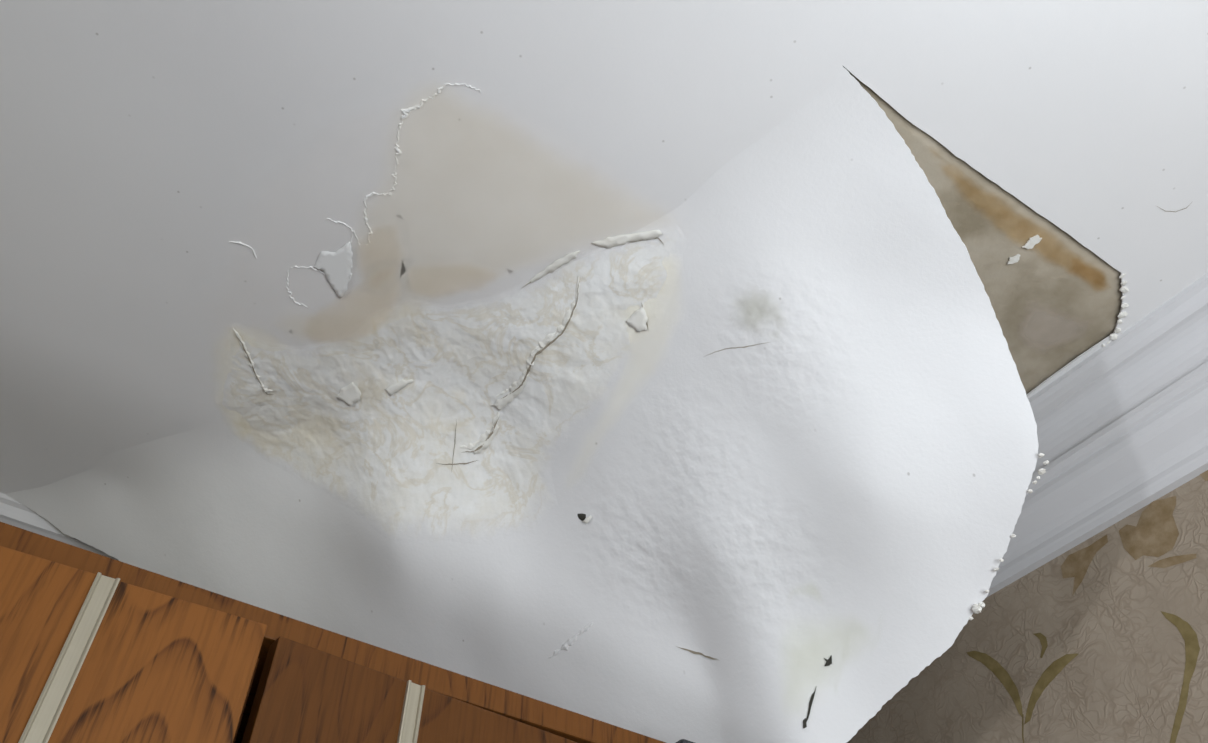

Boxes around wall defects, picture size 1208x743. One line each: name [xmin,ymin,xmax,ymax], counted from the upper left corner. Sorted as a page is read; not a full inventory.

peeling [286,83,481,308]
spalling [213,224,687,548]
peeling [843,66,1129,395]